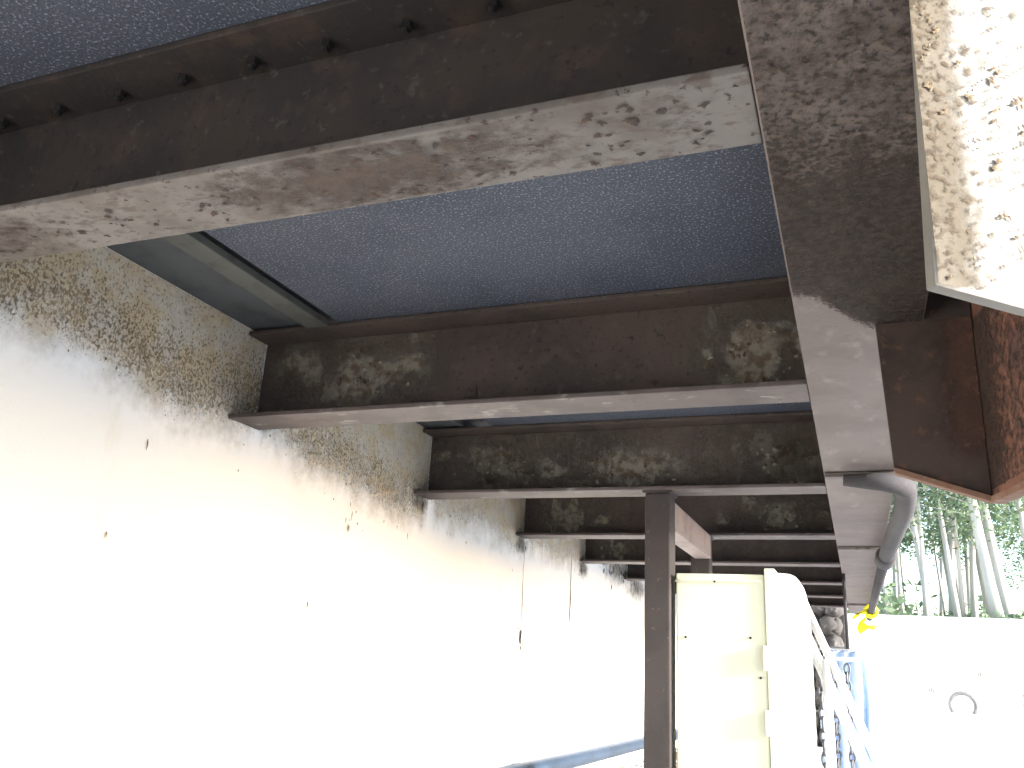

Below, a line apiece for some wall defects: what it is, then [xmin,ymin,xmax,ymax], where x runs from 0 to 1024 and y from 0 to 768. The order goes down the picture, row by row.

corrosion [187,130,559,222]
corrosion [580,114,631,166]
corrosion [927,306,1024,490]